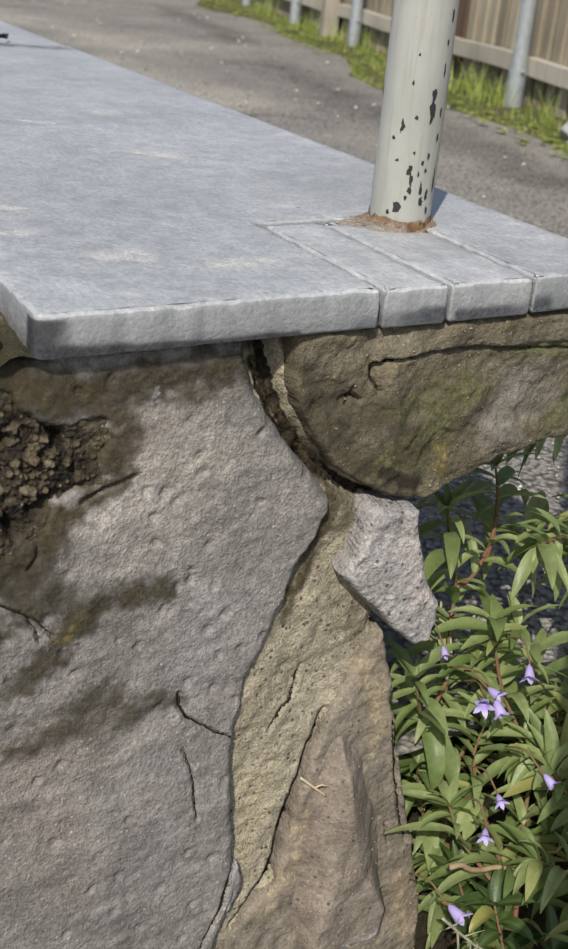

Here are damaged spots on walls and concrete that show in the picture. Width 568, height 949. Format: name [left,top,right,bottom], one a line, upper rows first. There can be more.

peeling [429,89,442,125]
peeling [386,152,435,214]
rust [368,205,431,233]
crack [341,356,415,398]
spalling [0,391,122,567]
damp [0,313,344,700]
crack [1,606,51,643]
damp [4,680,185,759]
crack [176,693,231,738]
crack [267,669,297,730]
crack [182,750,197,819]